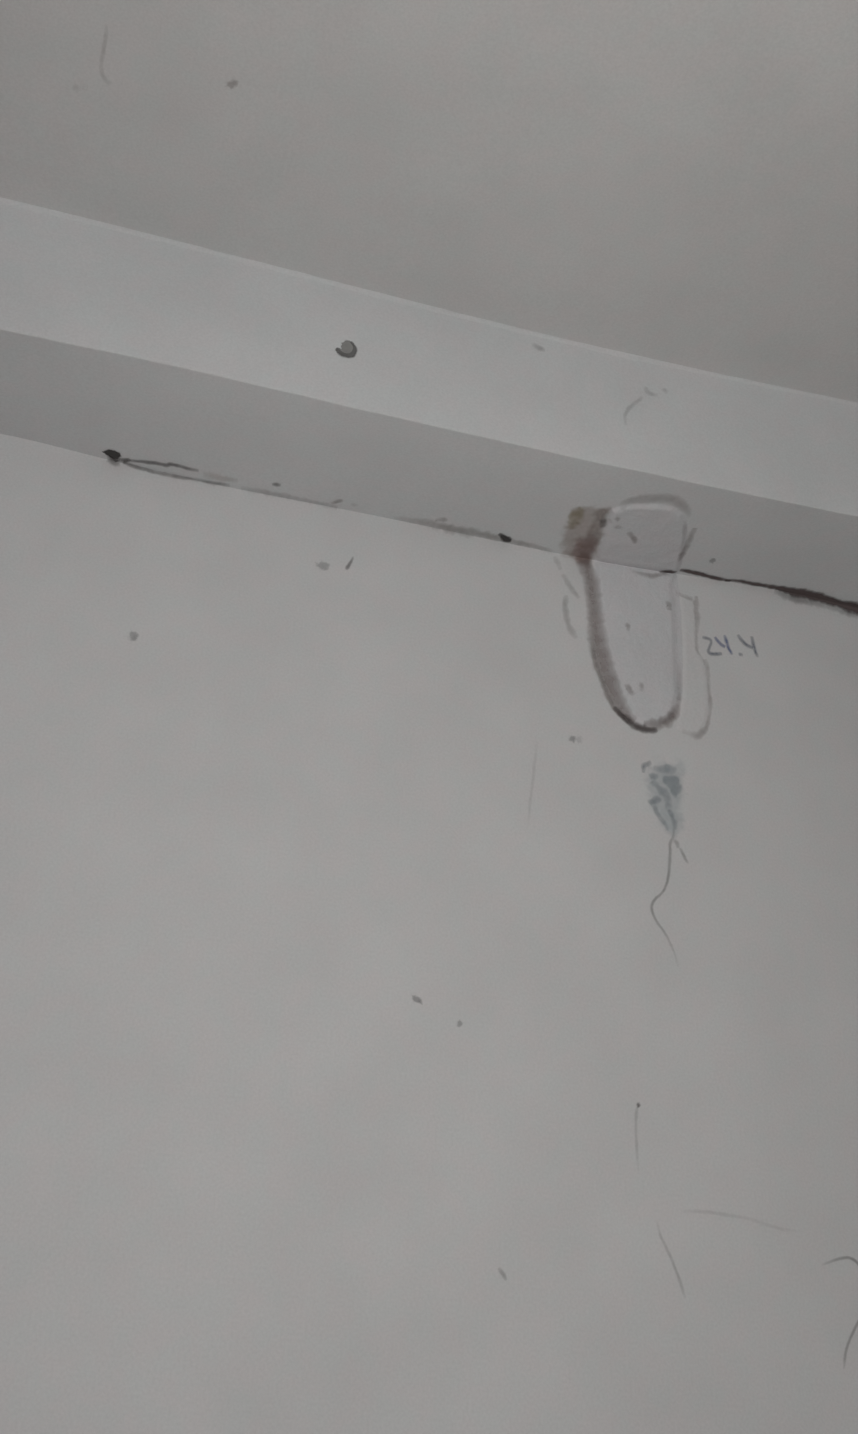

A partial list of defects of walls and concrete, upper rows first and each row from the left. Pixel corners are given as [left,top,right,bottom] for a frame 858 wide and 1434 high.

crack [103,450,178,466]
crack [499,534,511,542]
crack [661,569,858,614]
leakage [586,569,674,732]